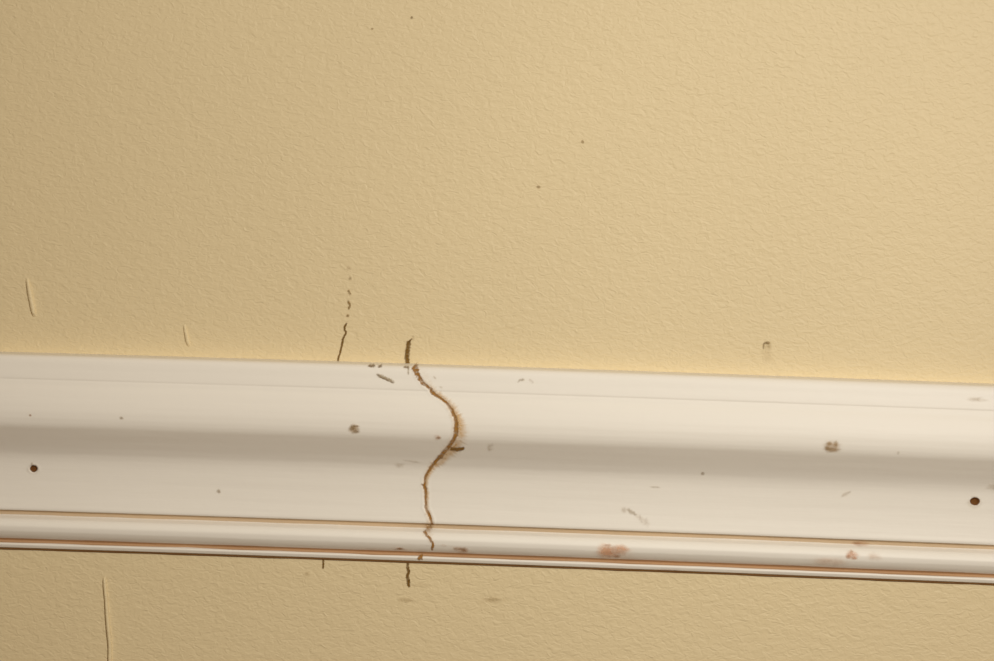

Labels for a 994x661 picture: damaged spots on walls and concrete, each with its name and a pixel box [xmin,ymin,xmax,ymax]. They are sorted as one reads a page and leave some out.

crack [337,291,351,361]
crack [404,339,464,587]